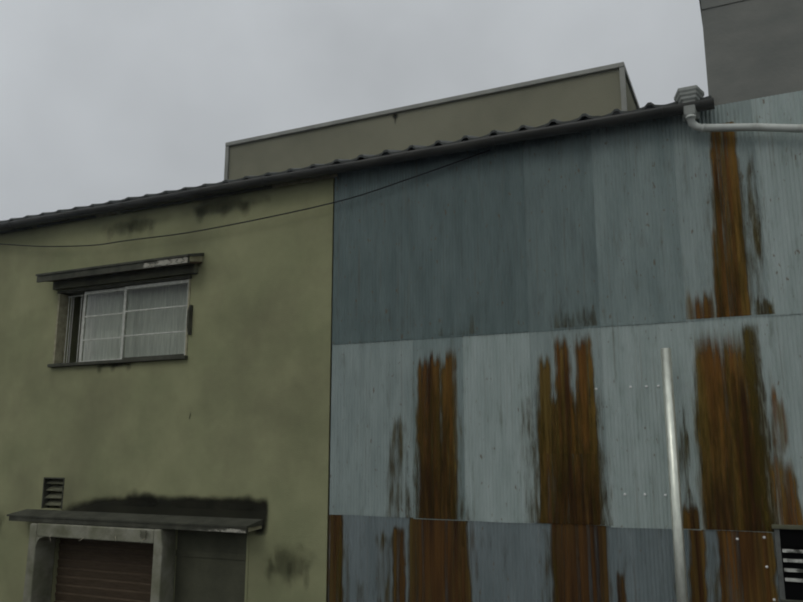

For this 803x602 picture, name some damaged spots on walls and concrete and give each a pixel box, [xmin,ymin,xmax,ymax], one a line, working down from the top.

corrosion [688,121,774,319]
corrosion [328,515,348,602]
corrosion [380,350,472,602]
corrosion [523,338,626,602]
corrosion [680,326,803,602]